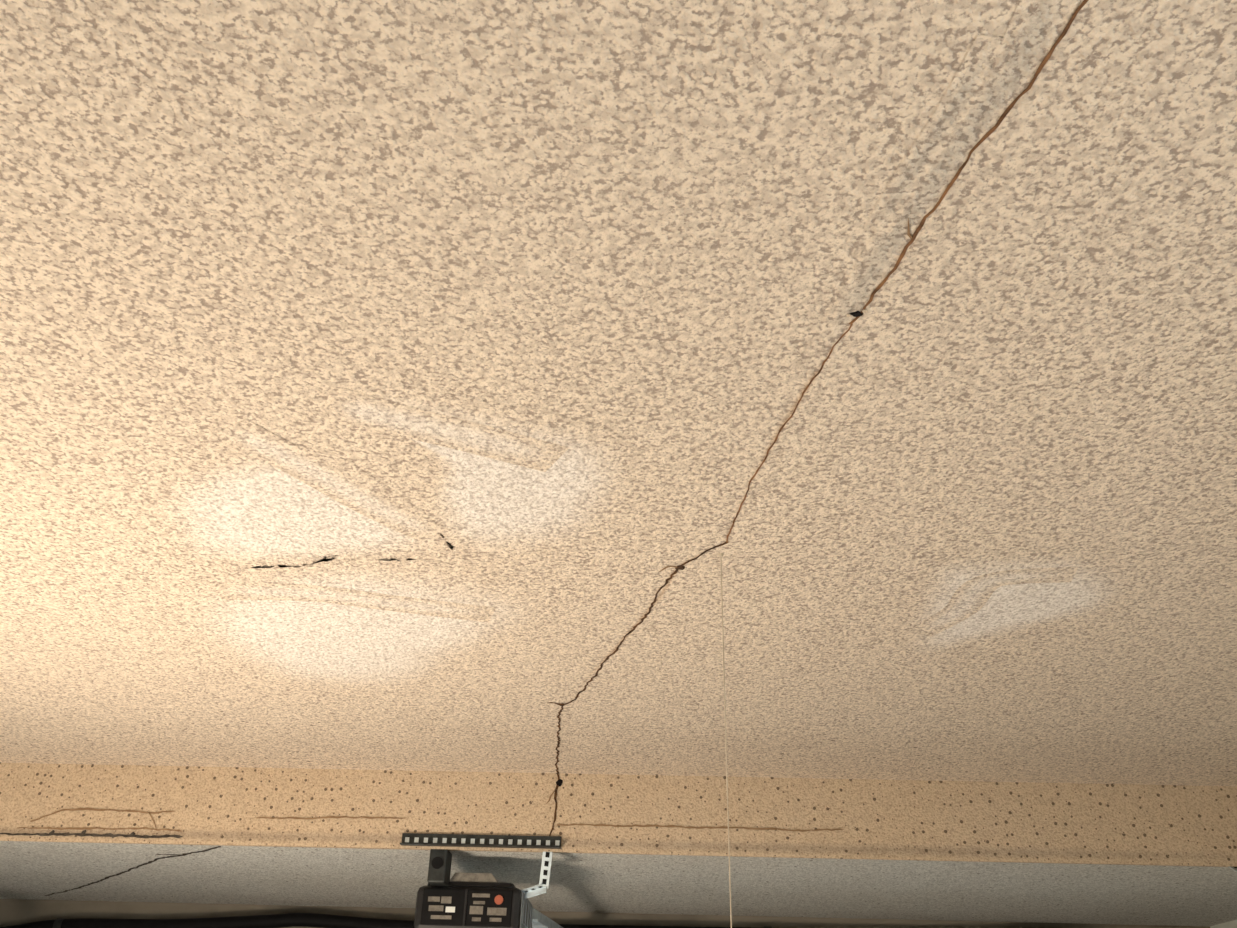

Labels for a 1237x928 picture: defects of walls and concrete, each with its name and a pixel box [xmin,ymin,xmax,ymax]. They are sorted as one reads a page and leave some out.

damp [142,380,642,695]
crack [546,0,1089,836]